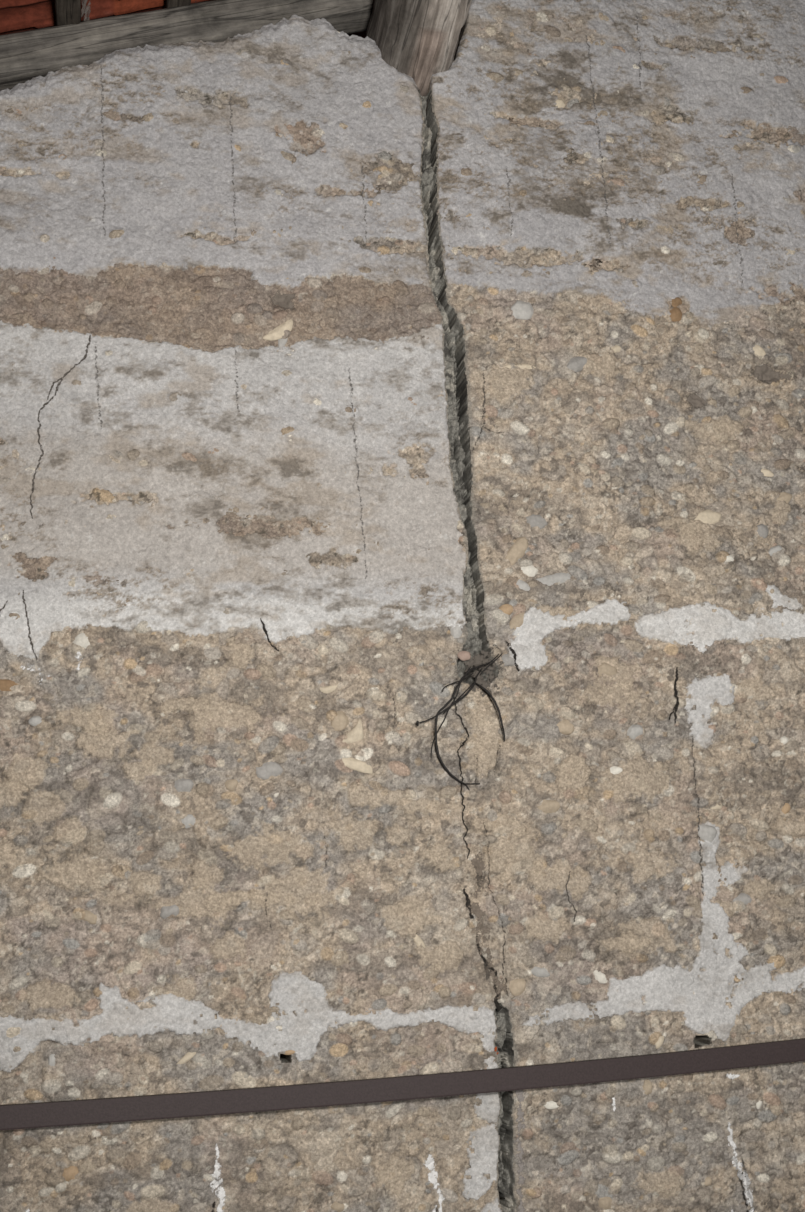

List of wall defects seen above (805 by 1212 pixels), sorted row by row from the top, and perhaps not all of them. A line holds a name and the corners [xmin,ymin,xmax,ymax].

crack [30,336,91,519]
crack [418,87,520,1212]
leakage [210,1144,225,1212]
efflorescence [423,1154,445,1212]
leakage [727,1122,754,1212]